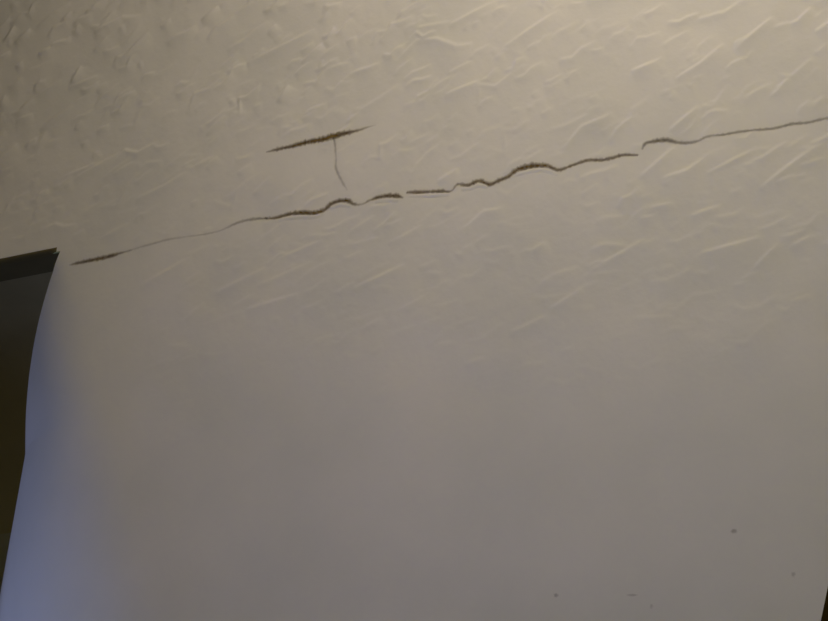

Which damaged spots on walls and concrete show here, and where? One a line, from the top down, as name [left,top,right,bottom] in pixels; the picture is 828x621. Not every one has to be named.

crack [274,130,358,150]
crack [268,139,689,223]
crack [75,253,120,264]